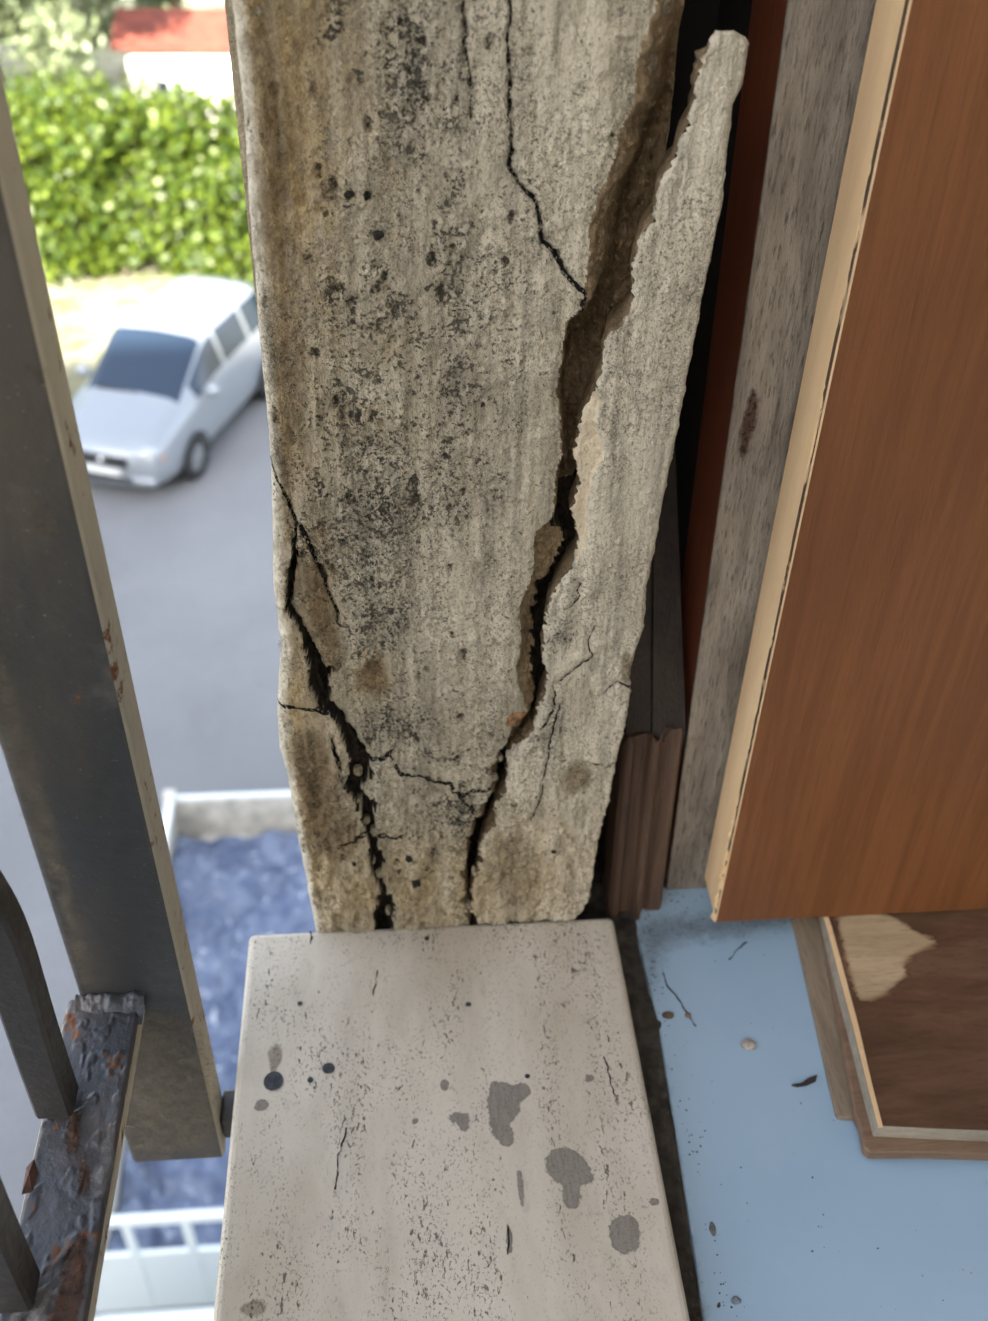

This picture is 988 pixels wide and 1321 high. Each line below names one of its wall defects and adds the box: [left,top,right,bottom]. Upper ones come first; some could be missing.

crack [461,1,473,120]
crack [506,0,587,314]
crack [270,456,578,930]
rust [65,1112,90,1197]
rust [48,1235,87,1321]